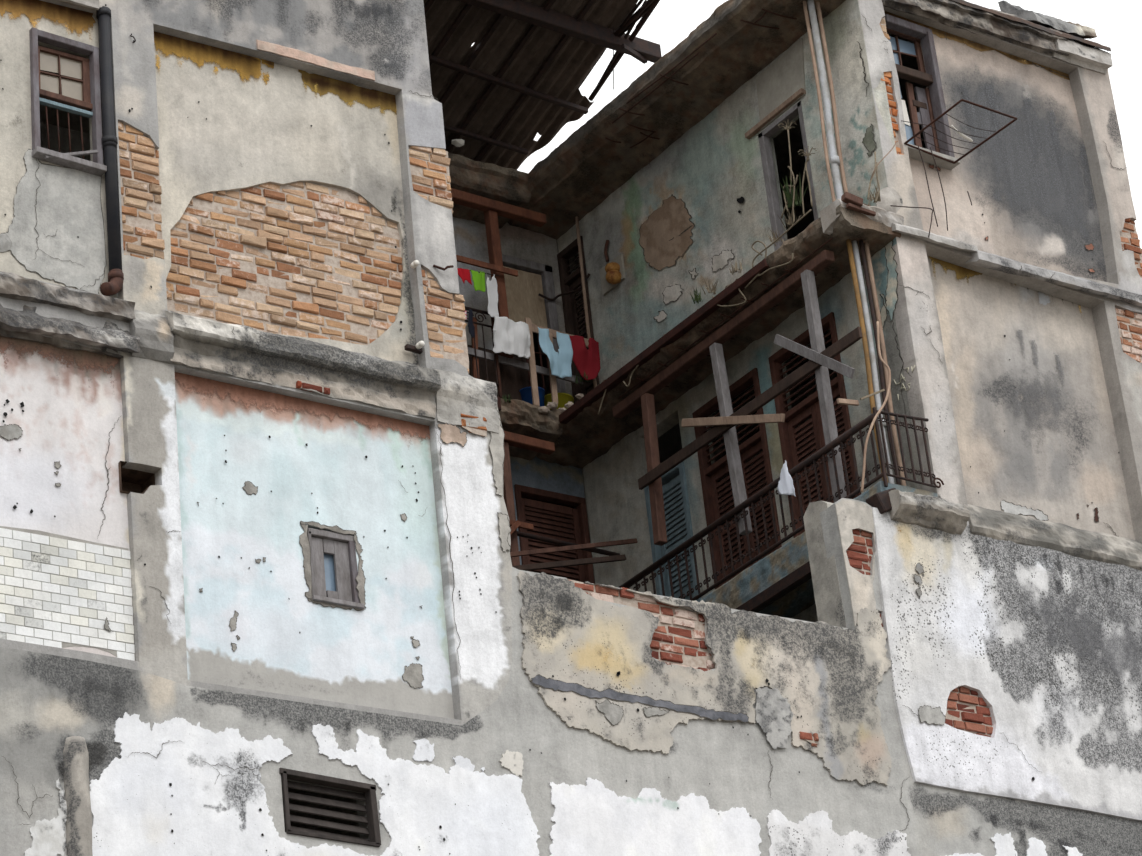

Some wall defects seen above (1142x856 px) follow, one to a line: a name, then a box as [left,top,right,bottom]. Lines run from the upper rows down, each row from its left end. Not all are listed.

spalling [0,149,107,294]
crack [34,159,106,289]
flaking render [118,108,403,345]
damp [959,83,1092,240]
crack [97,419,119,539]
flaking render [846,529,873,575]
mould [86,742,107,770]
peeling [90,712,911,856]
flaking render [517,571,892,786]
flaking render [918,686,993,737]
peeling [946,832,1047,856]
damp [1024,554,1142,684]